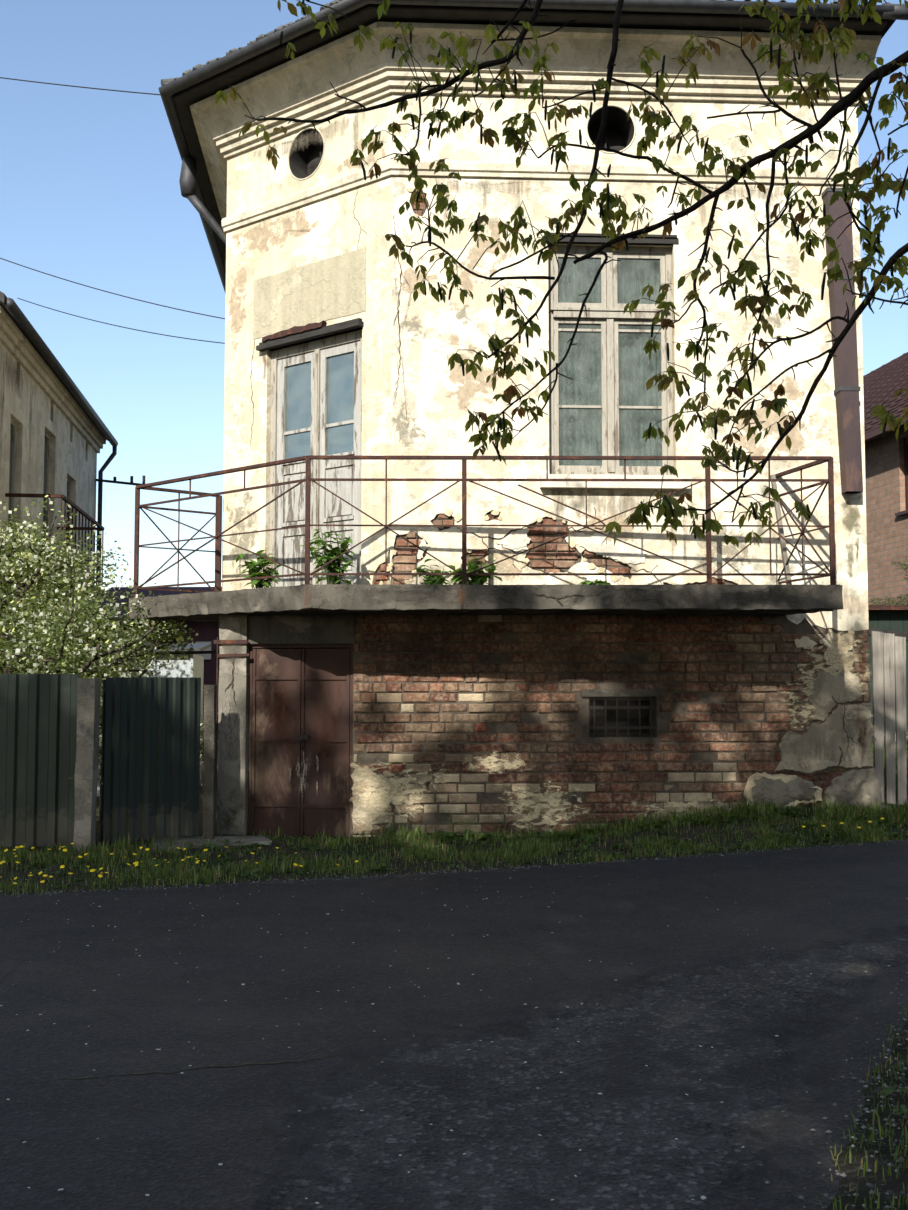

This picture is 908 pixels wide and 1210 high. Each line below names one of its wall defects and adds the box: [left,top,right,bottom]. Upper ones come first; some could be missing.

flaking render [431,508,462,531]
flaking render [374,531,430,585]
flaking render [461,516,647,582]